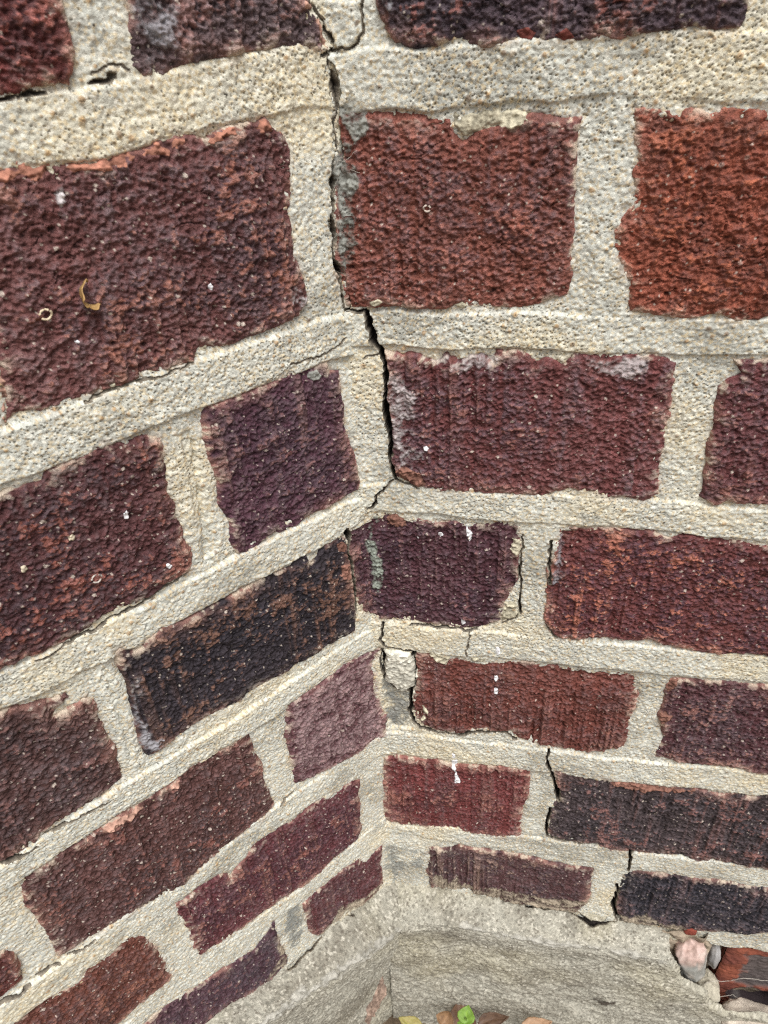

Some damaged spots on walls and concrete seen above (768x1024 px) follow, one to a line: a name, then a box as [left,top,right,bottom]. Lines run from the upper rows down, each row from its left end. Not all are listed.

crack [290,0,420,611]
peeling [382,649,428,724]
crack [544,748,583,846]
crack [524,849,634,928]